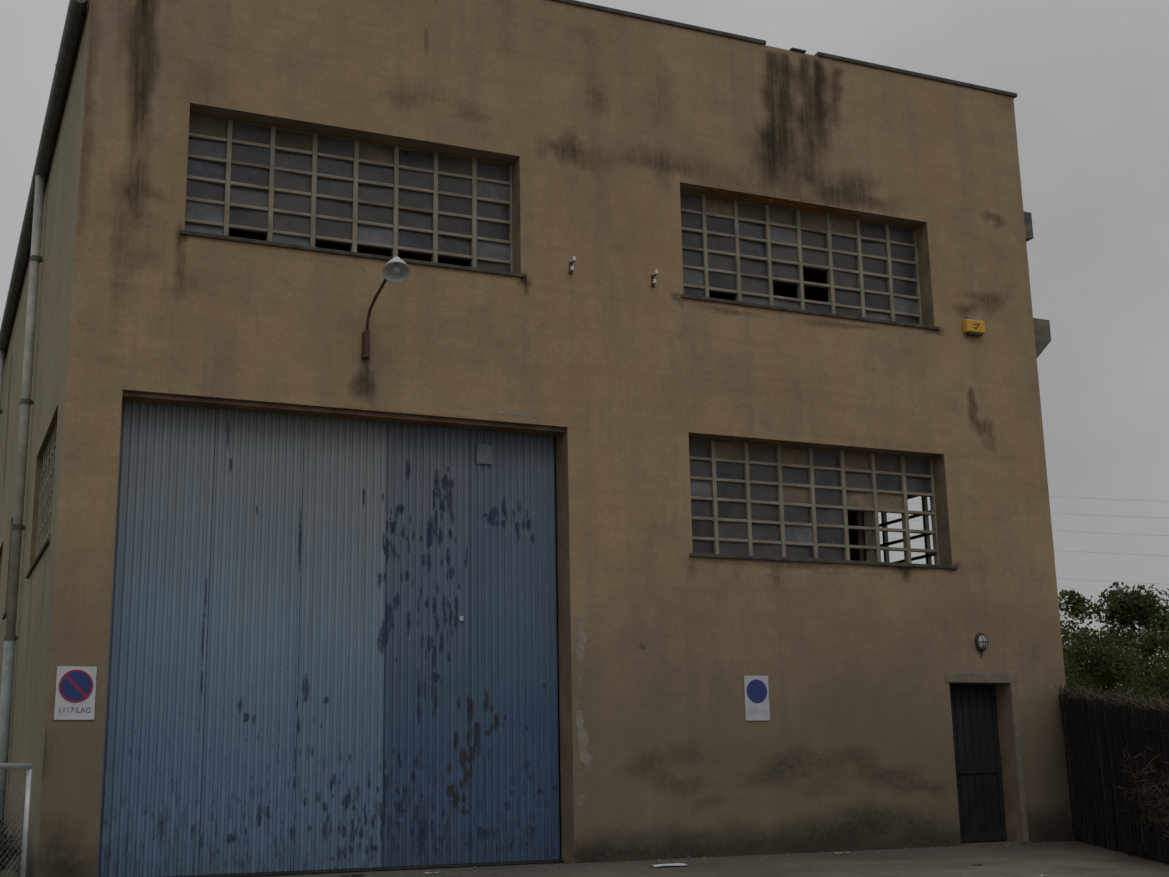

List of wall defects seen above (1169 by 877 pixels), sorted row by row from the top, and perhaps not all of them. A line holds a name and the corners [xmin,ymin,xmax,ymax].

damp [765,55,823,150]
peeling [378,467,468,722]
peeling [483,497,535,544]
peeling [290,691,557,860]